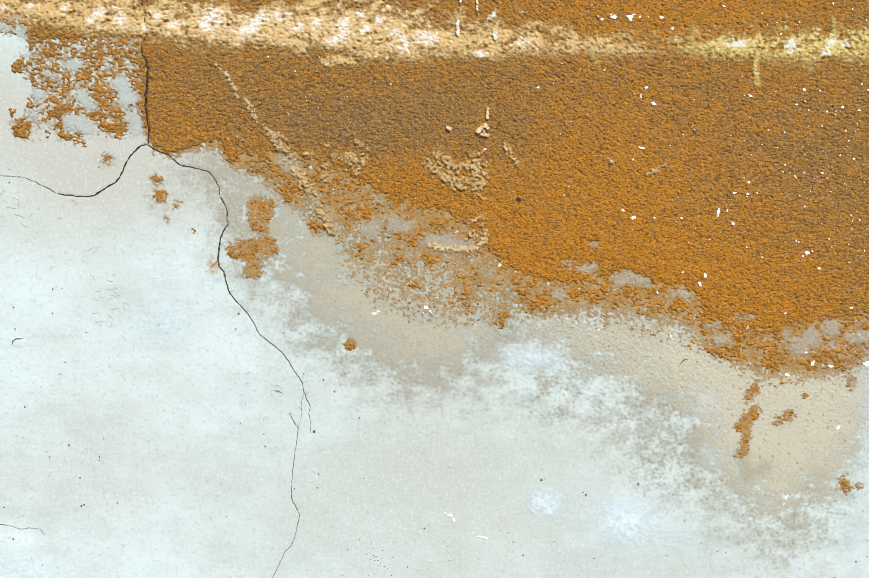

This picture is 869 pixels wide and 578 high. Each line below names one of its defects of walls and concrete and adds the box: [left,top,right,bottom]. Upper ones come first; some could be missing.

crack [3,0,311,576]
corrosion [0,0,869,458]
water stain [197,149,869,535]
water stain [602,502,648,541]